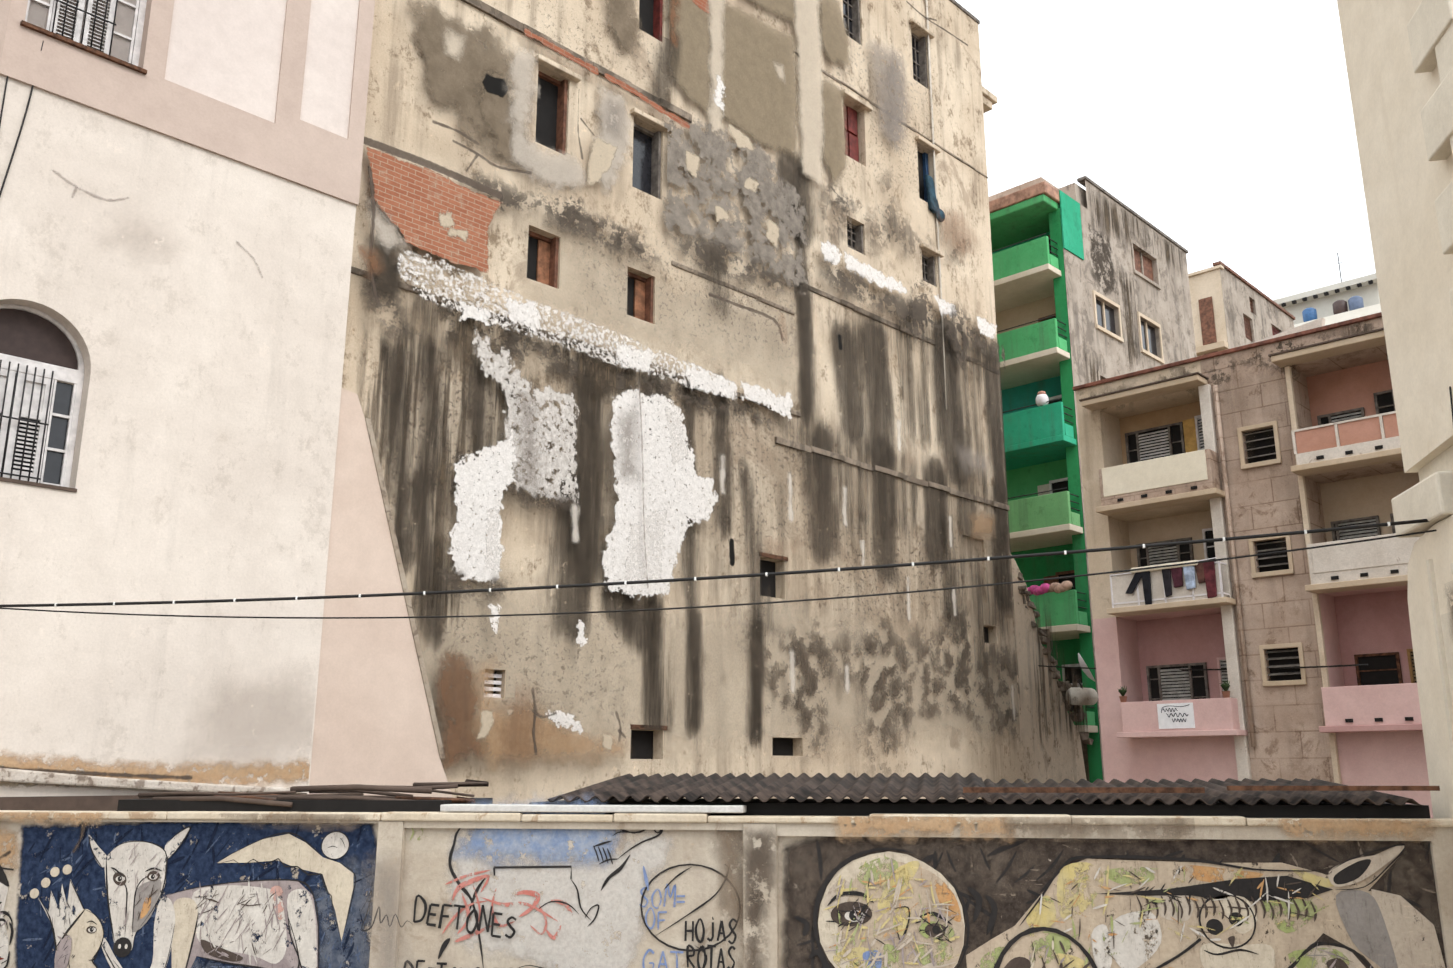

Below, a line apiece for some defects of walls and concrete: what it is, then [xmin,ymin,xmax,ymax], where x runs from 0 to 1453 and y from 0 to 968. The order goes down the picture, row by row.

peeling [364,137,793,634]
water stain [365,47,1088,770]
peeling [820,240,907,294]
peeling [0,755,310,786]